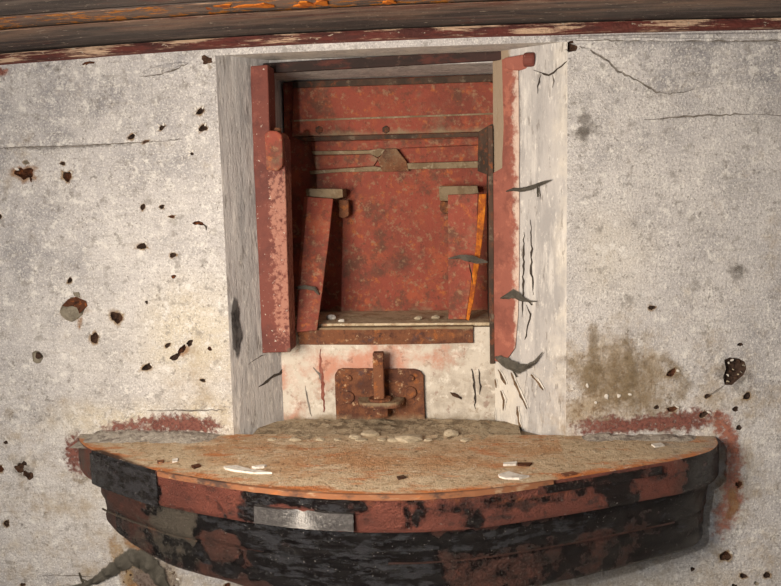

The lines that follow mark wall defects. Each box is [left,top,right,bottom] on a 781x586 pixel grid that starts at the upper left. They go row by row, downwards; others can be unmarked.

rust [466,194,487,320]
crack [522,220,534,339]
crack [471,369,482,409]